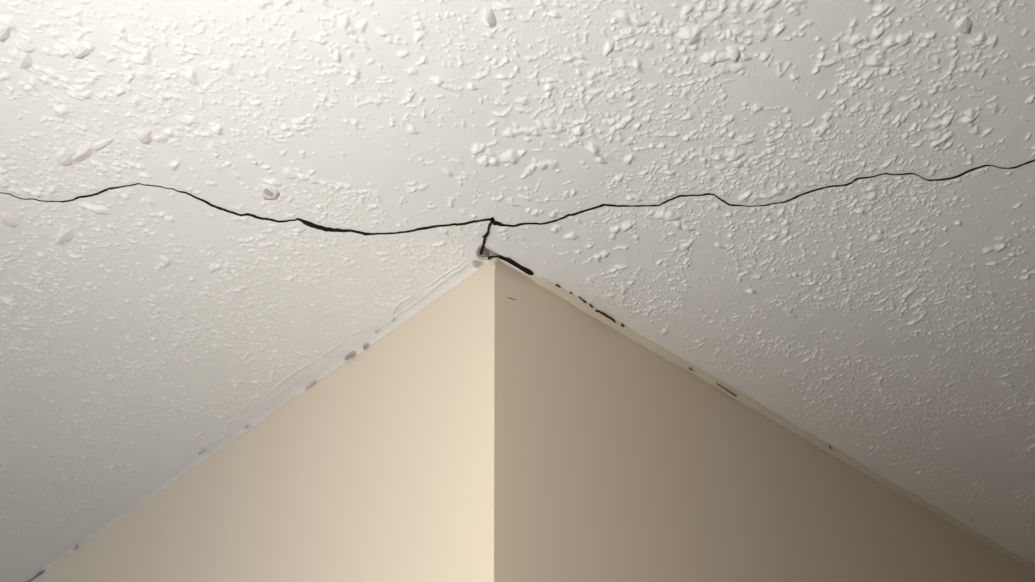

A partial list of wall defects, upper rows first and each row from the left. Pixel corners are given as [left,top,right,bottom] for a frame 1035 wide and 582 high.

crack [0,159,1035,255]